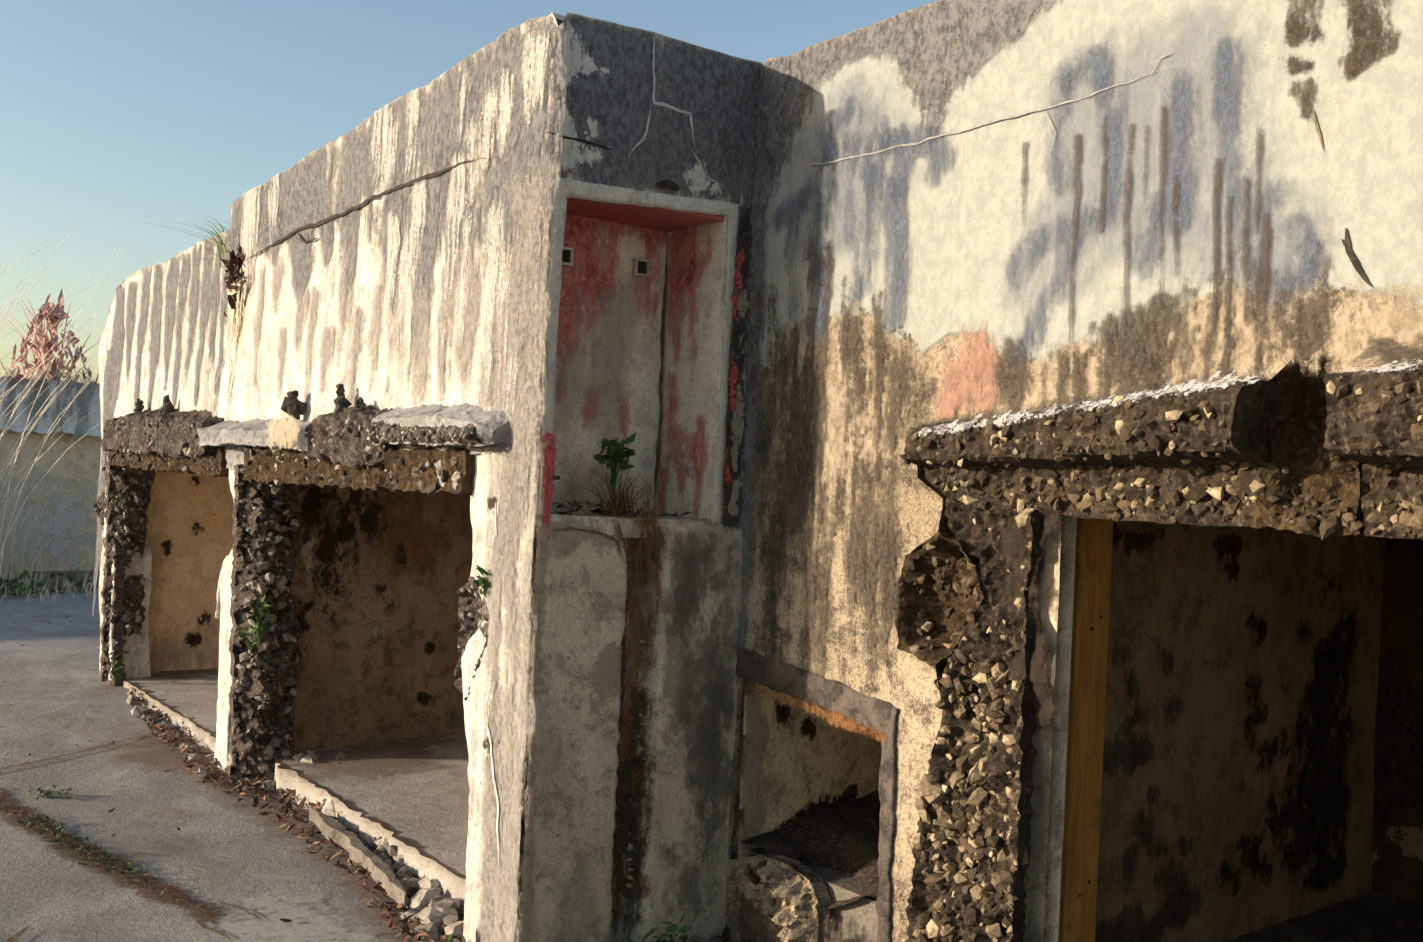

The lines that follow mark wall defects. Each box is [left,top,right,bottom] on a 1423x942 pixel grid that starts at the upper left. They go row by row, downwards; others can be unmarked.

crack [546,31,724,187]
crack [776,52,1178,170]
peeling [1285,0,1324,118]
peeling [1338,0,1399,79]
damp [4,0,1061,942]
damp [1112,523,1164,556]
spalling [900,347,1423,573]
damp [1213,533,1242,583]
corrosion [613,530,668,911]
spalling [736,693,809,928]
spalling [893,531,1037,942]
damp [1095,609,1423,942]